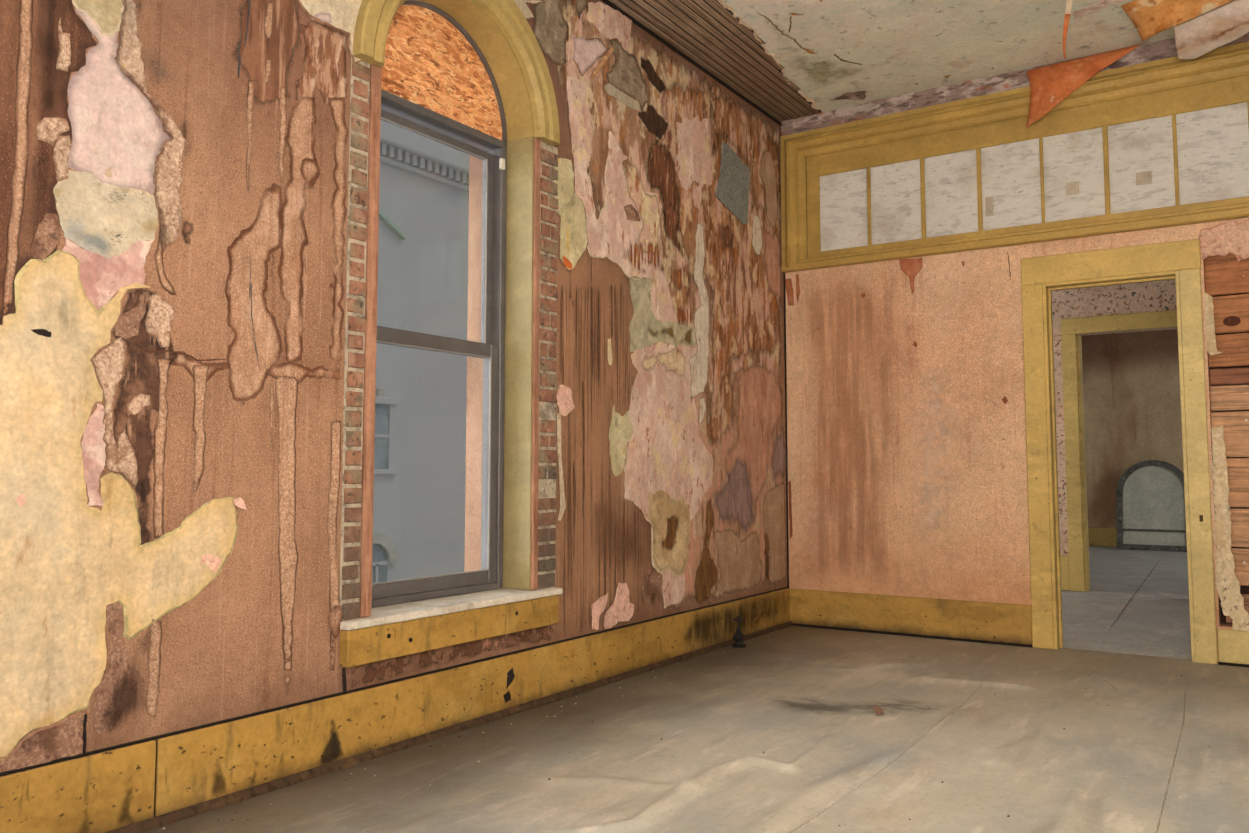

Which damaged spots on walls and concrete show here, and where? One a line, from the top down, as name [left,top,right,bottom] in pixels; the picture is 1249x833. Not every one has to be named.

peeling [68,0,171,197]
peeling [0,238,247,761]
peeling [591,583,634,630]
peeling [538,2,782,609]